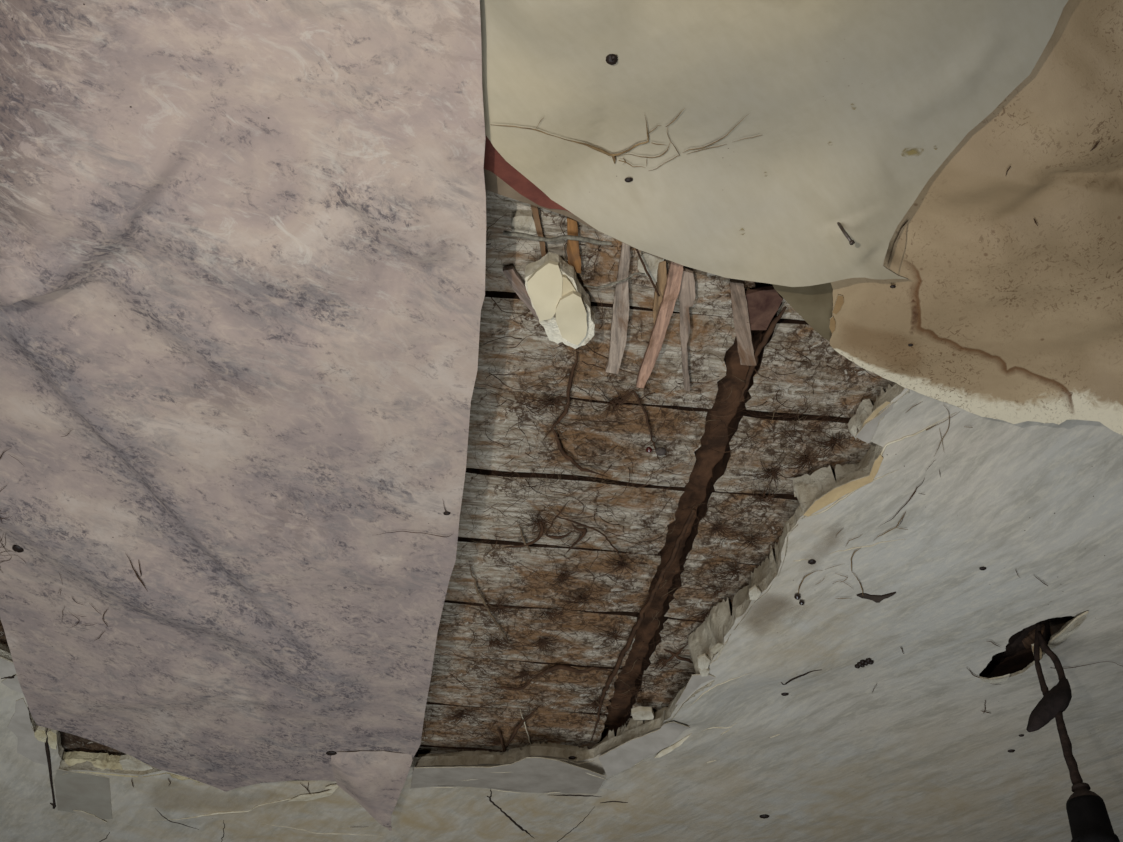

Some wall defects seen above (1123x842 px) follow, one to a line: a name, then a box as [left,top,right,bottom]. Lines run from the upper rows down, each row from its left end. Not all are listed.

water stain [915,272,1071,402]
peeling [410,383,910,794]
spalling [979,611,1089,684]
crack [155,808,225,842]